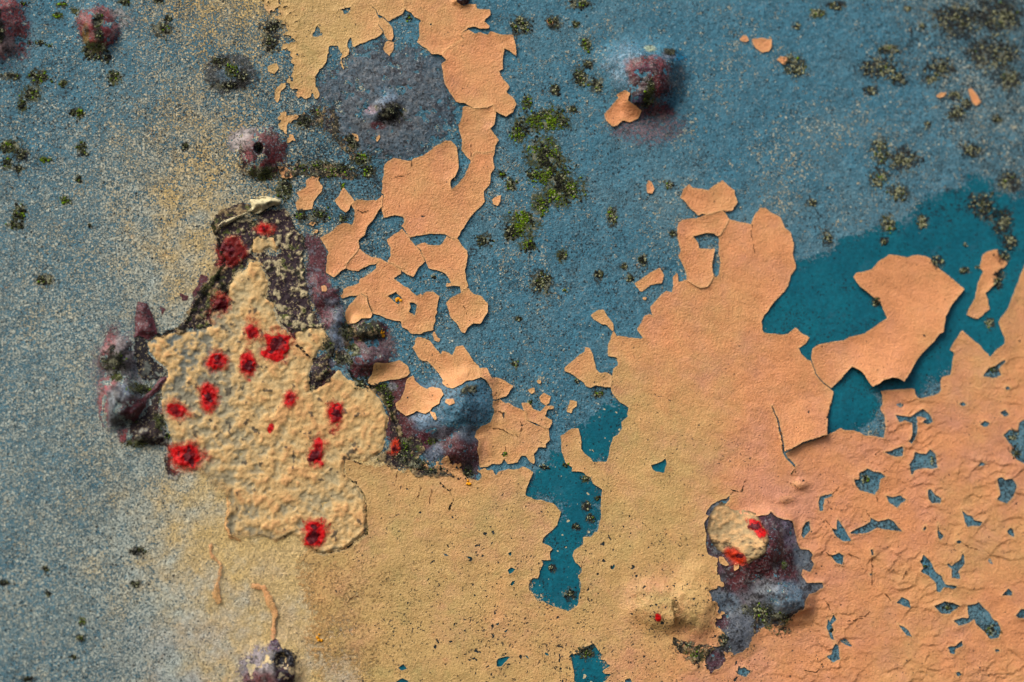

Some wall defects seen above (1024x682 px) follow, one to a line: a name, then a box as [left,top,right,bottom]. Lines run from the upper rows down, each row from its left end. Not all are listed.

mould [853,41,909,96]
mould [922,0,1024,122]
peeling [264,0,517,342]
mould [884,145,924,178]
mould [915,214,930,230]
mould [956,141,985,158]
mould [965,168,1022,290]
peeling [133,173,1024,682]